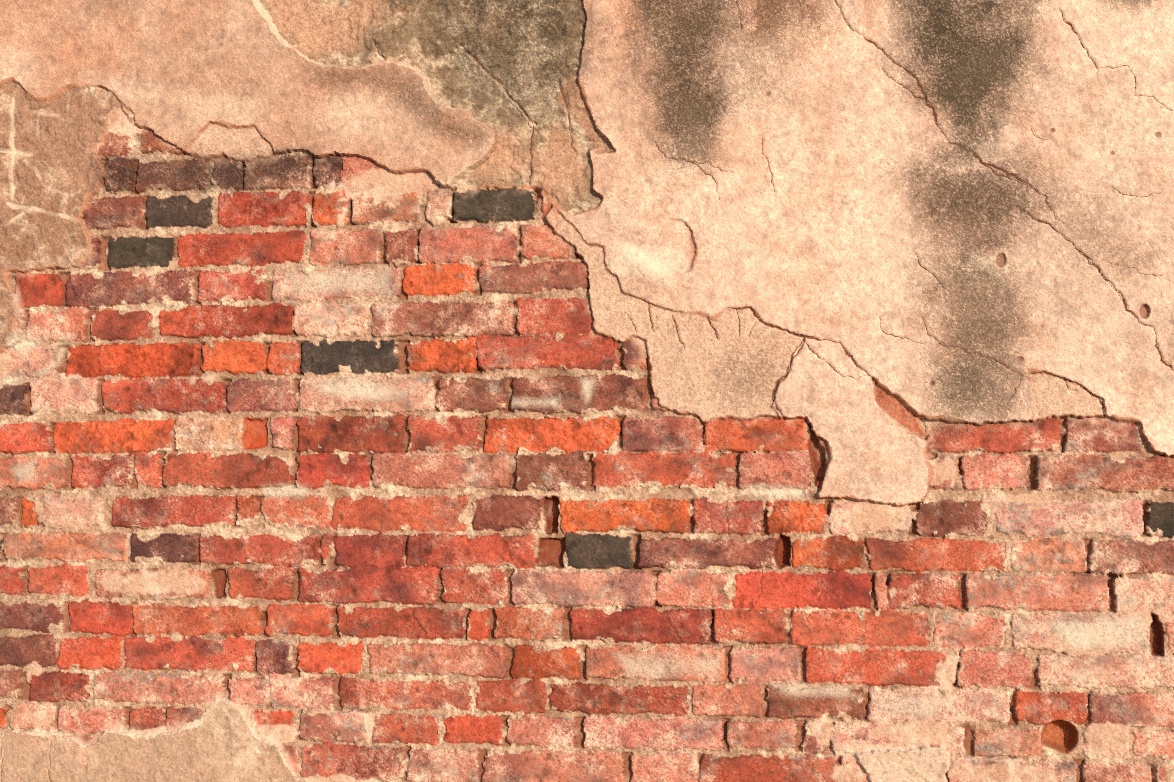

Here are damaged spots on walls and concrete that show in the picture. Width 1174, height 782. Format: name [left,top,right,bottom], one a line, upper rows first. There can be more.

leakage [641,0,724,152]
leakage [907,0,1024,155]
flaking render [0,0,834,472]
leakage [918,173,1026,224]
crack [835,0,1173,370]
crack [628,304,685,349]
crack [707,306,877,418]
leakage [948,266,1011,402]
crack [880,317,1105,416]
flaking render [872,356,1174,504]
spalling [766,485,886,535]
flaking render [0,697,280,764]